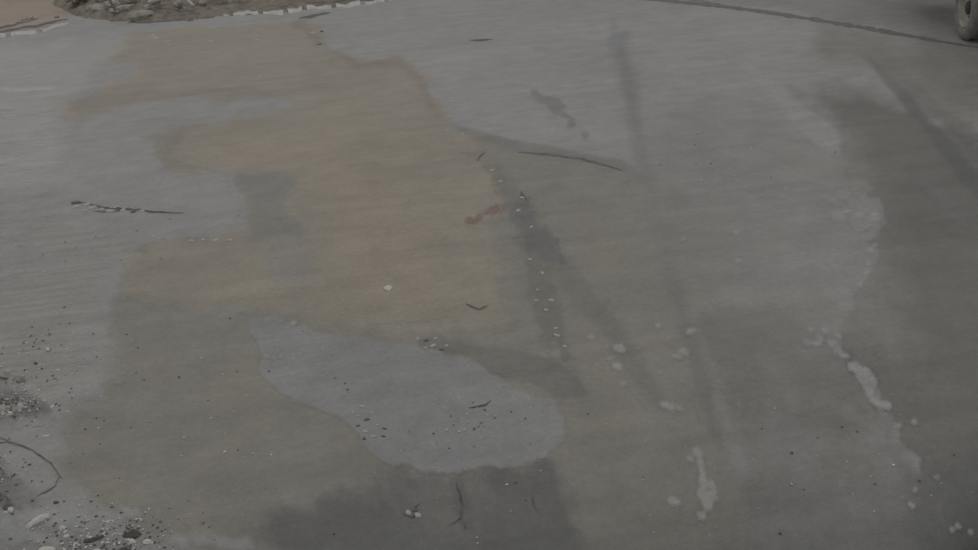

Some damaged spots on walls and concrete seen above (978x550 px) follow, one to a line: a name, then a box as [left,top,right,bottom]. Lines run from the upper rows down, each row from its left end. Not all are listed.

spalling [215,0,393,17]
spalling [0,19,82,38]
damp [210,17,978,550]